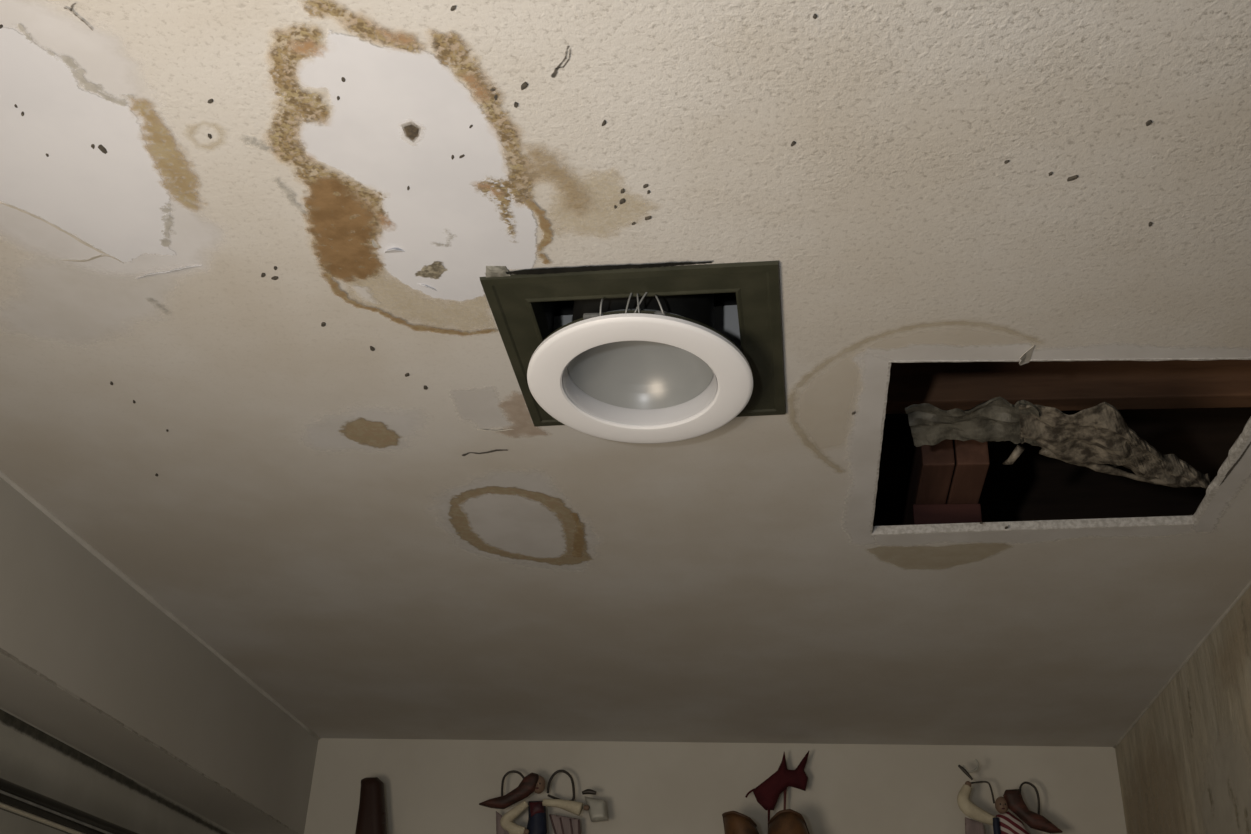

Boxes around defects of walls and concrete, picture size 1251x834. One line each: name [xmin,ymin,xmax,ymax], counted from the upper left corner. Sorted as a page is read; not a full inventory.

peeling [0,0,222,344]
damp [131,100,198,210]
peeling [293,30,538,303]
damp [528,149,651,234]
damp [306,409,420,450]
damp [436,472,594,570]